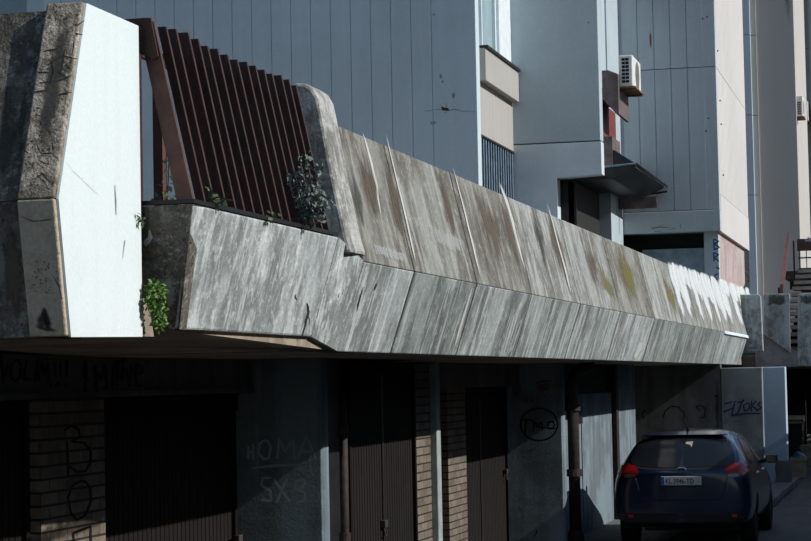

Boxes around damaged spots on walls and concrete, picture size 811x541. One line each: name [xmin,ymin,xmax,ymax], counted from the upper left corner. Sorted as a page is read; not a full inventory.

crack [35,20,85,95]
crack [24,142,58,186]